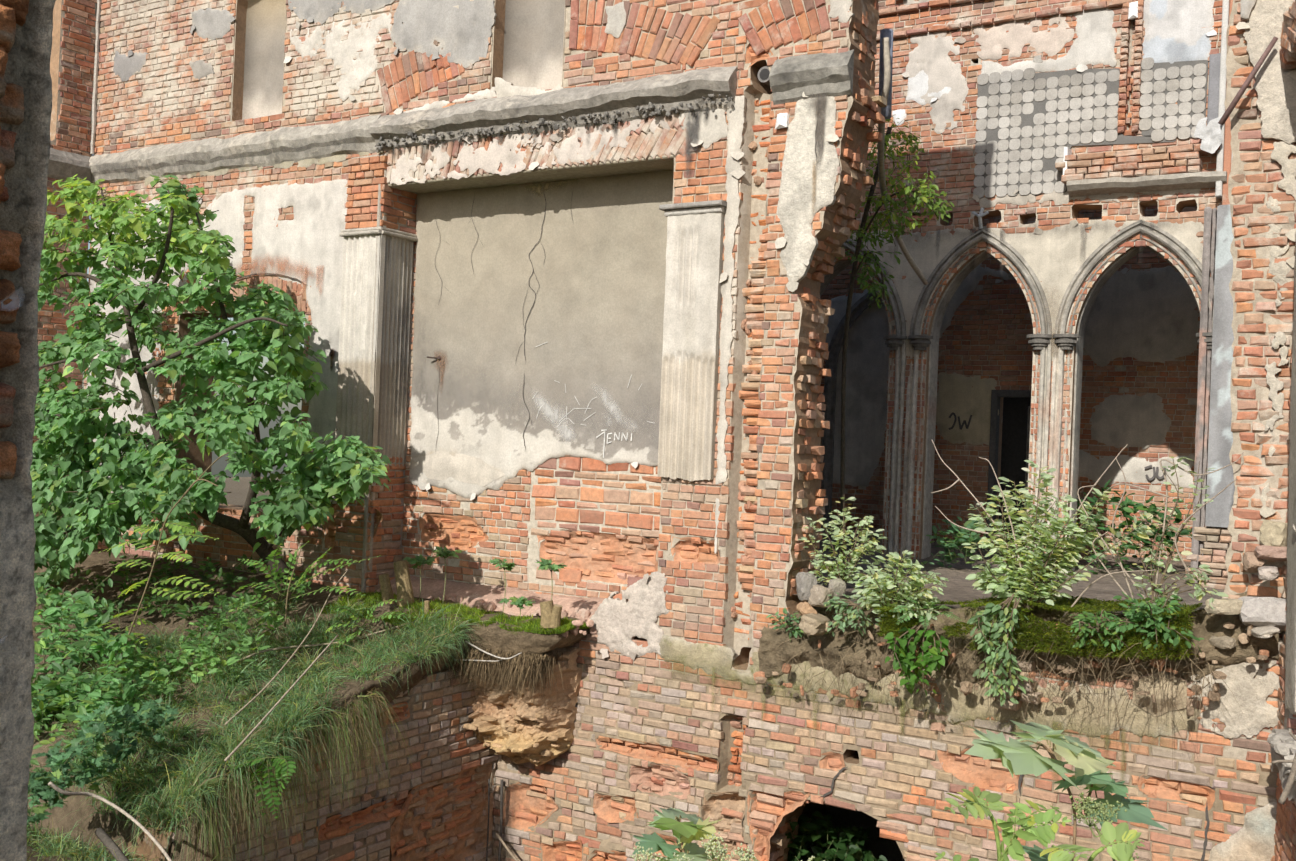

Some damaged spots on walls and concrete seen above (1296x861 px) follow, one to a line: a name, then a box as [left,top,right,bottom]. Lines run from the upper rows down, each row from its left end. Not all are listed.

flaking render [113,47,148,82]
flaking render [85,199,219,453]
crack [515,188,573,449]
flaking render [144,0,1296,739]